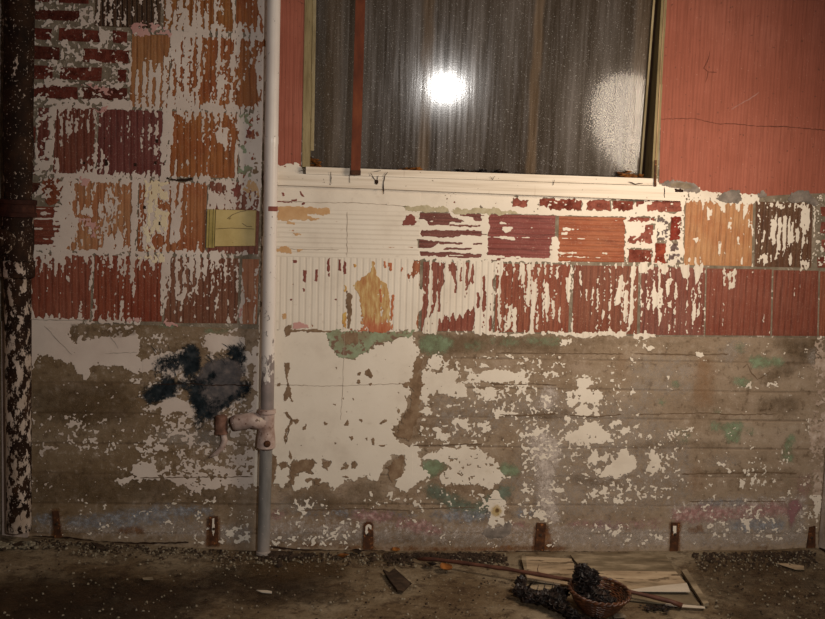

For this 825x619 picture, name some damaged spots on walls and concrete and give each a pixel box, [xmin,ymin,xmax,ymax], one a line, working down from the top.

peeling [278,162,303,174]
crack [662,118,825,131]
peeling [32,0,267,545]
peeling [270,185,825,551]
crack [817,460,825,552]